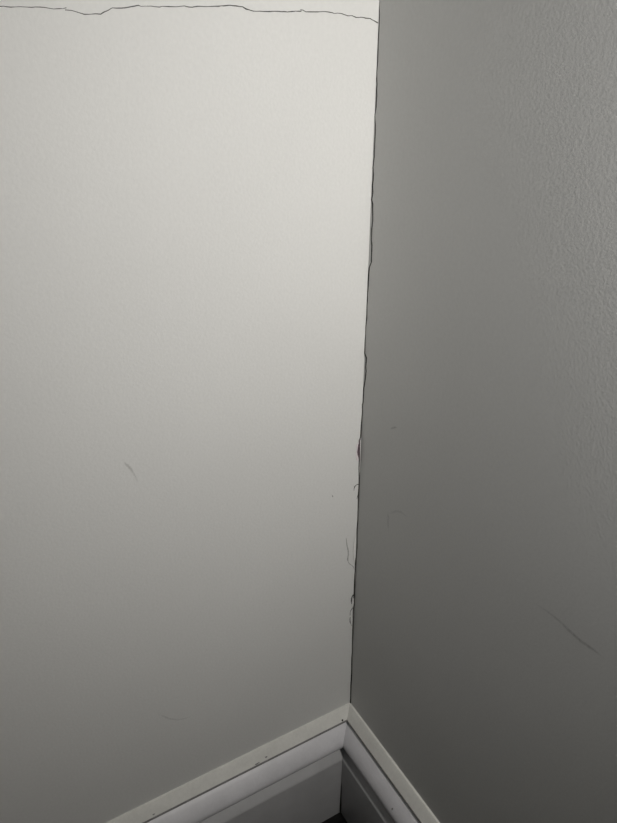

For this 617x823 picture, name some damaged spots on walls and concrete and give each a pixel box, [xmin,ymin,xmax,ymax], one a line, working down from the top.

crack [0,0,380,703]